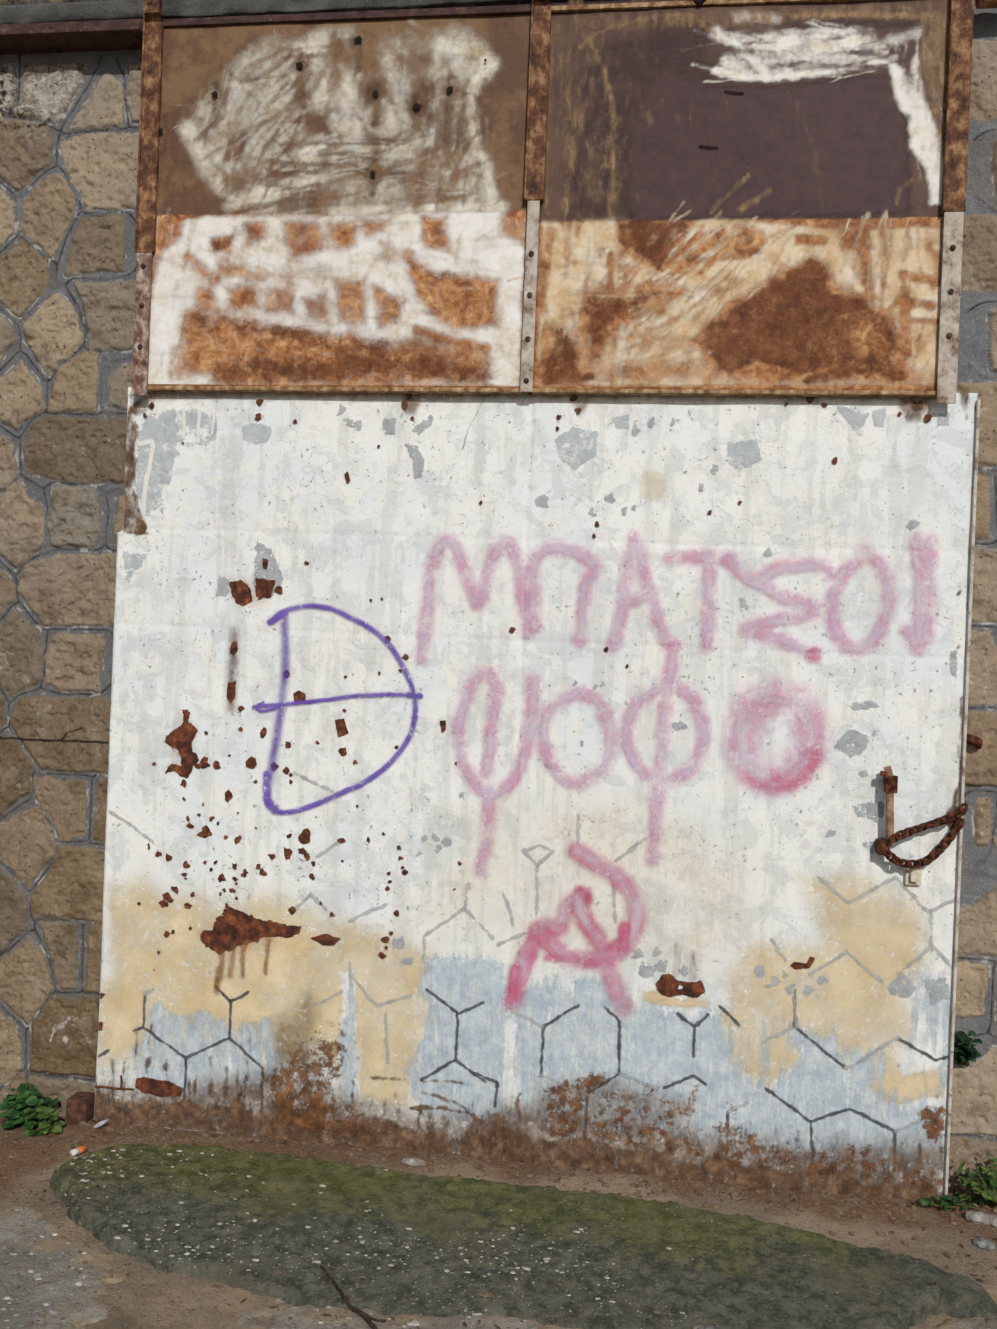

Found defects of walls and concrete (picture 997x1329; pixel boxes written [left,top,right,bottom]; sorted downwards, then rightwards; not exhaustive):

peeling [705,13,943,205]
peeling [148,31,532,395]
peeling [538,212,943,386]
corrosion [704,259,903,384]
peeling [134,402,216,518]
peeling [377,395,433,479]
peeling [555,395,598,470]
corrosion [229,558,282,606]
corrosion [164,709,221,788]
corrosion [875,766,898,855]
corrosion [200,907,341,992]
corrosion [94,1025,946,1199]